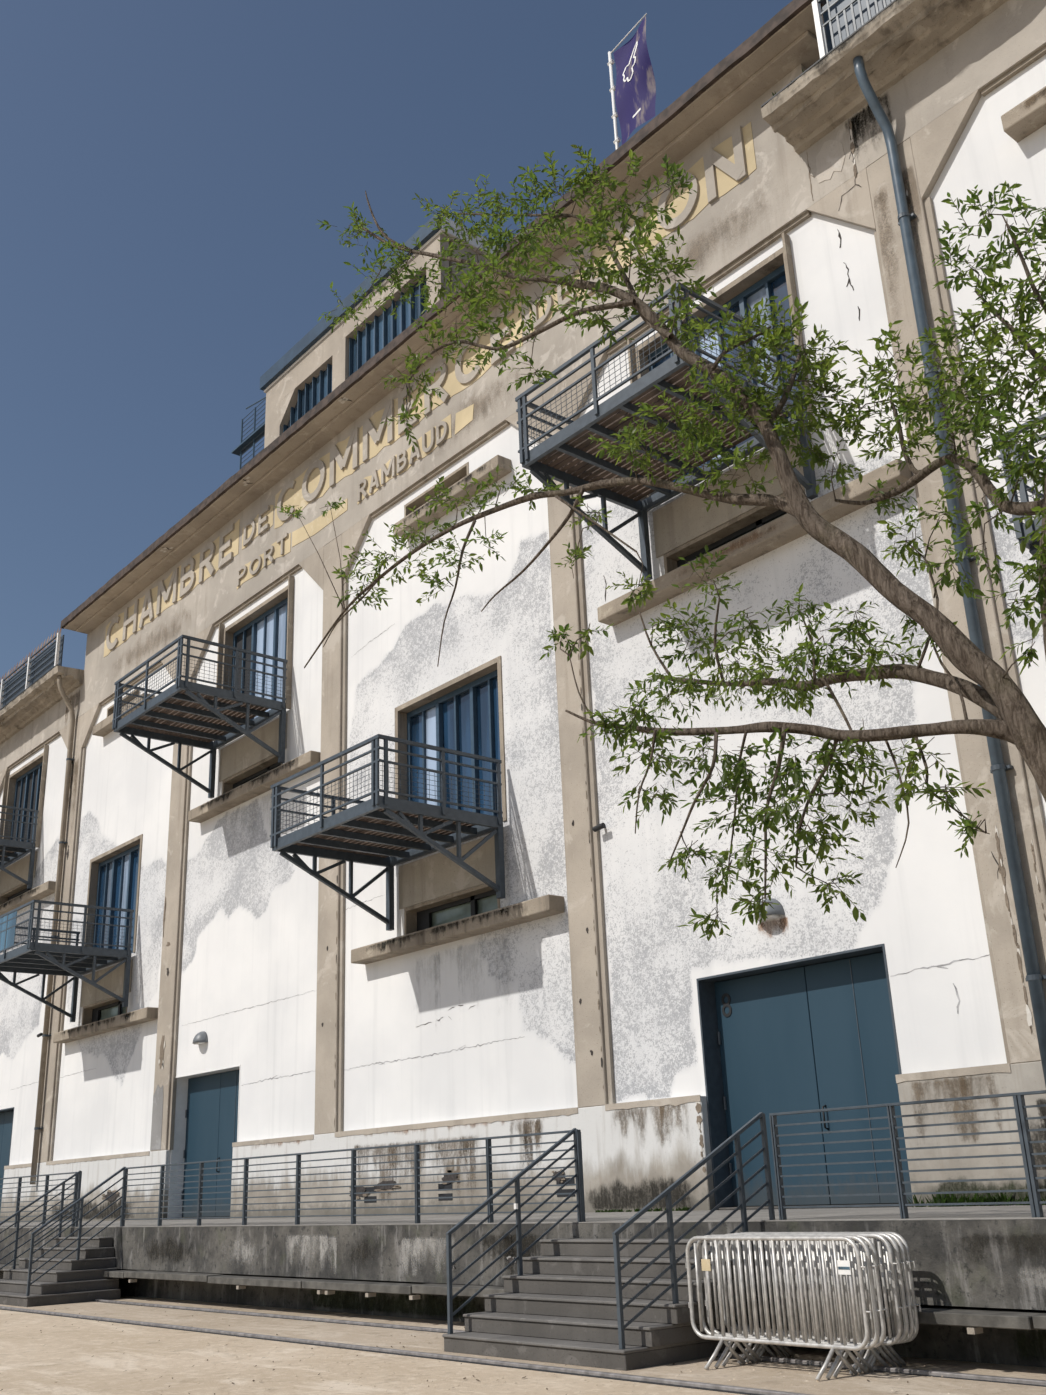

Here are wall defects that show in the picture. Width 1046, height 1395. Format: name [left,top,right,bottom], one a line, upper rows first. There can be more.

crack [807,128,861,321]
crack [897,954,990,1014]
water stain [519,1121,541,1163]
water stain [618,1105,681,1140]
water stain [914,1077,997,1140]
mould [590,1179,690,1209]